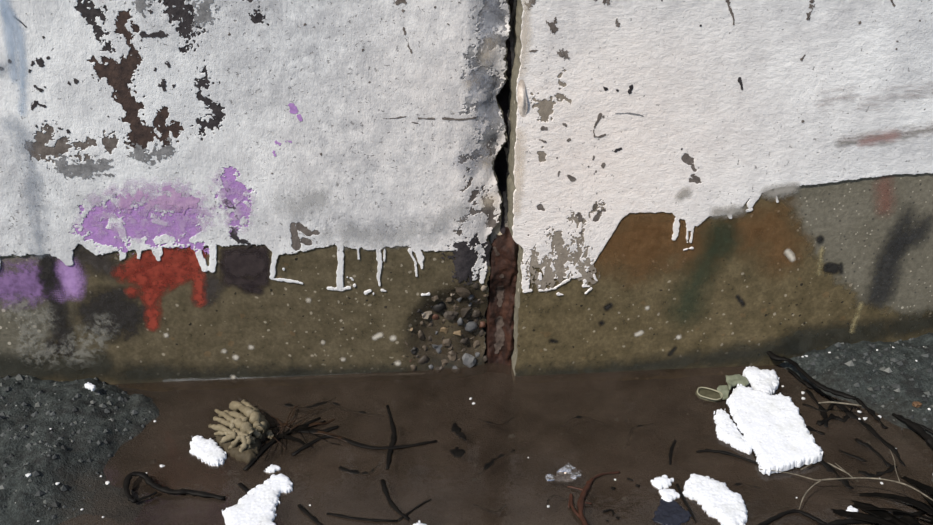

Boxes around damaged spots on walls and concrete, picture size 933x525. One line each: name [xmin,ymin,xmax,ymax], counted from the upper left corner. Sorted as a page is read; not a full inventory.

peeling [22,0,226,184]
peeling [231,0,269,26]
crack [494,0,514,234]
corrosion [484,227,519,374]